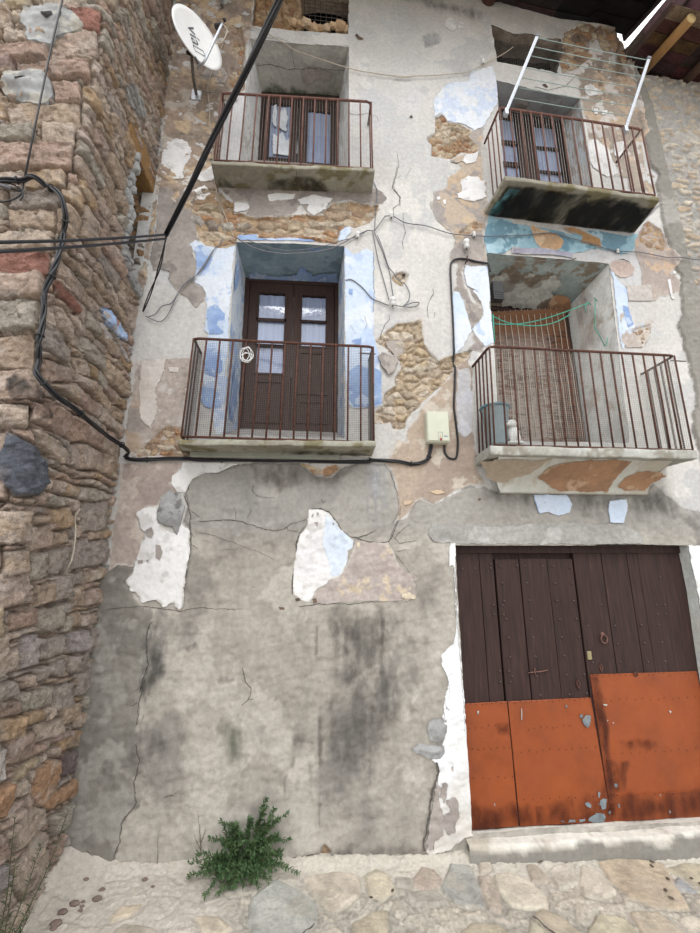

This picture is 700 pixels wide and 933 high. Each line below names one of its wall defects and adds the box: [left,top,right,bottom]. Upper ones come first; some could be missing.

peeling [109,0,682,610]
leakage [142,649,163,692]
crack [107,472,432,857]
leakage [336,626,374,663]
peeling [426,781,460,851]